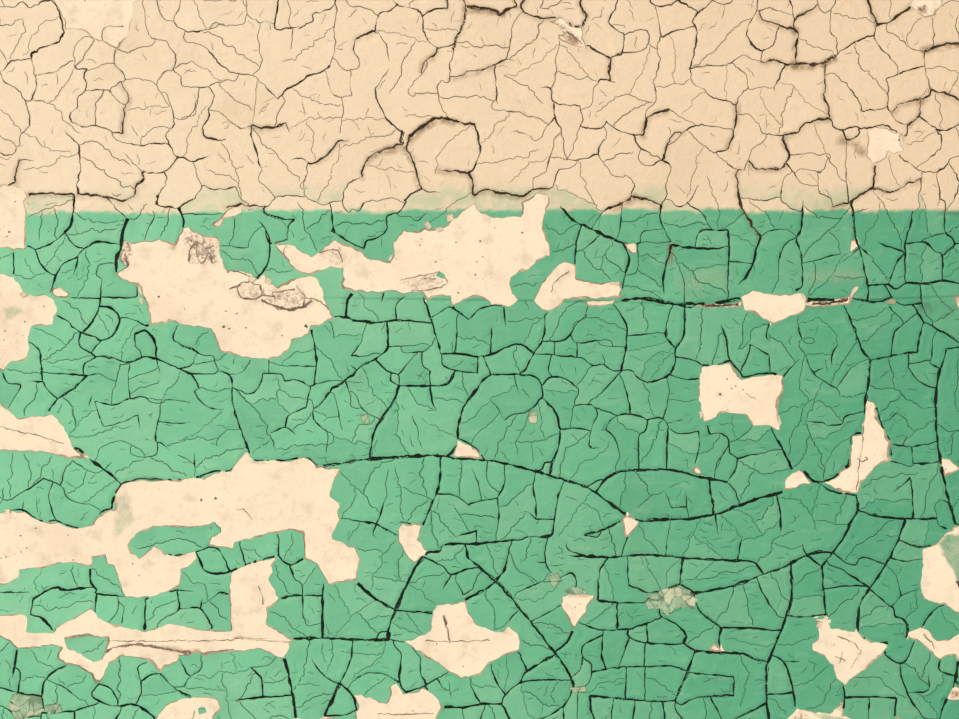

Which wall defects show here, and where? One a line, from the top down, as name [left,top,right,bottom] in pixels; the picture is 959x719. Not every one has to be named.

peeling [115,193,550,359]
crack [2,372,21,408]
peeling [698,363,784,431]
crack [178,449,234,478]
crack [12,499,43,522]
peeling [0,452,361,598]
crack [0,568,124,631]
peeling [0,557,295,682]
peeling [405,600,520,678]
peeling [812,615,887,688]
crack [808,641,959,719]
crack [922,605,959,631]